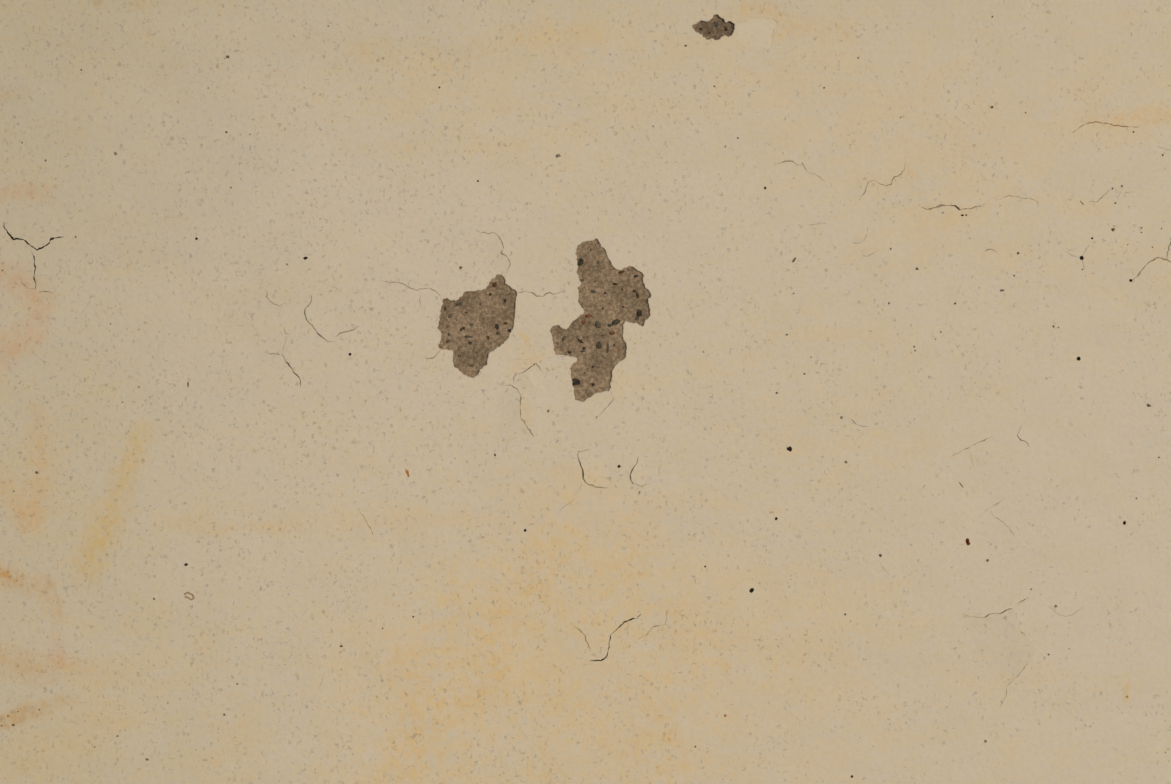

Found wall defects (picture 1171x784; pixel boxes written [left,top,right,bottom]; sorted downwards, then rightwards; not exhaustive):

spalling [692,14,735,41]
crack [921,190,1039,210]
crack [3,226,61,292]
crack [1133,243,1171,280]
peeling [436,274,518,378]
peeling [549,238,652,403]
crack [573,610,668,665]